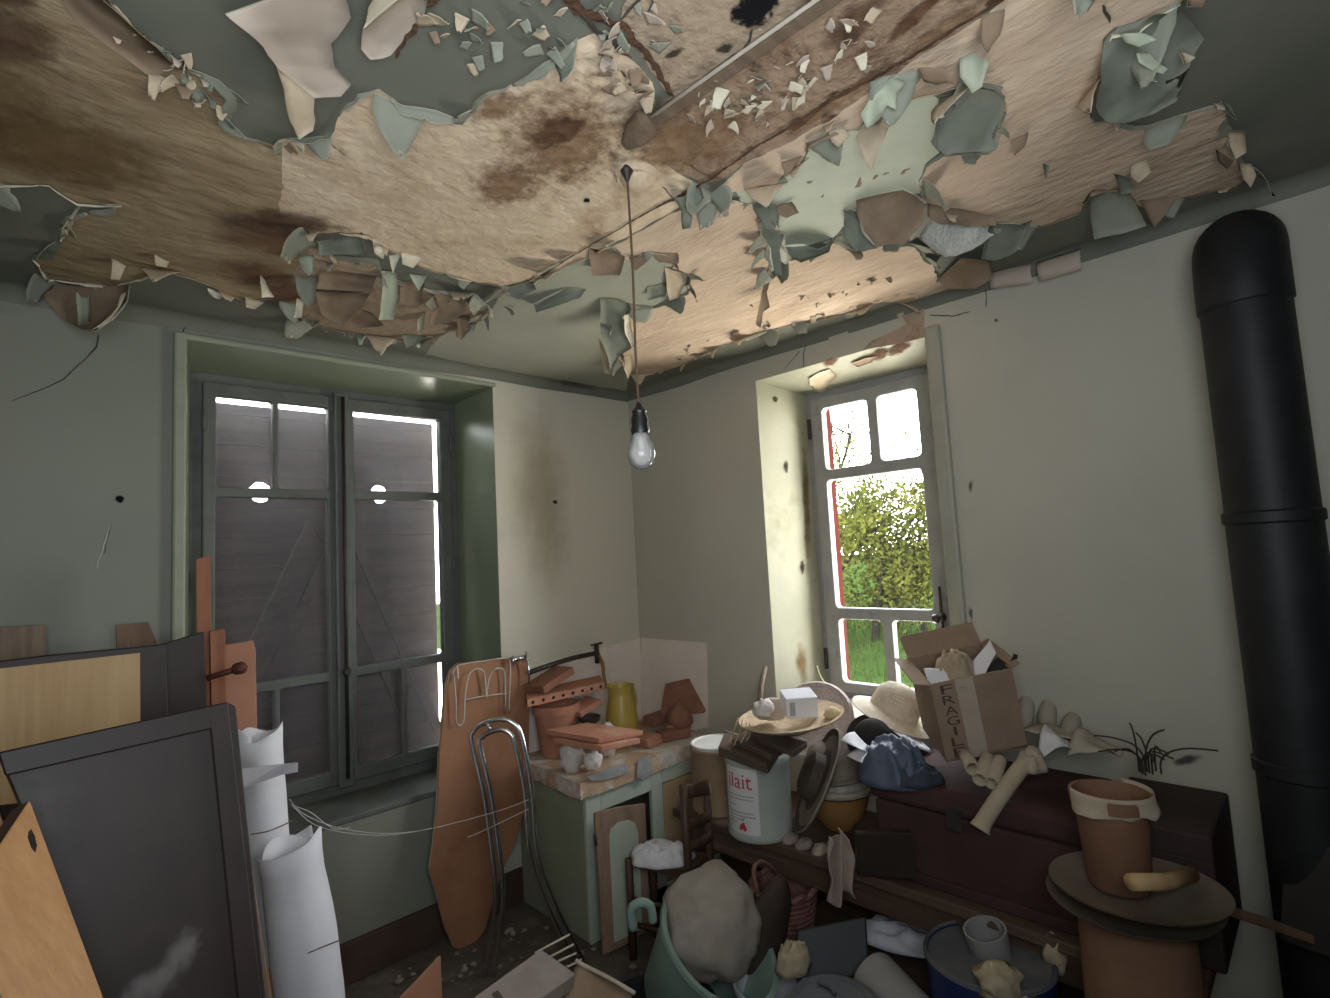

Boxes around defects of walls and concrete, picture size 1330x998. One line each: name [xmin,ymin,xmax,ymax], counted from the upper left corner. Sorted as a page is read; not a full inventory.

damp [0,0,141,183]
crack [395,0,440,58]
peeling [0,0,1276,394]
crack [439,0,1004,289]
crack [12,334,99,401]